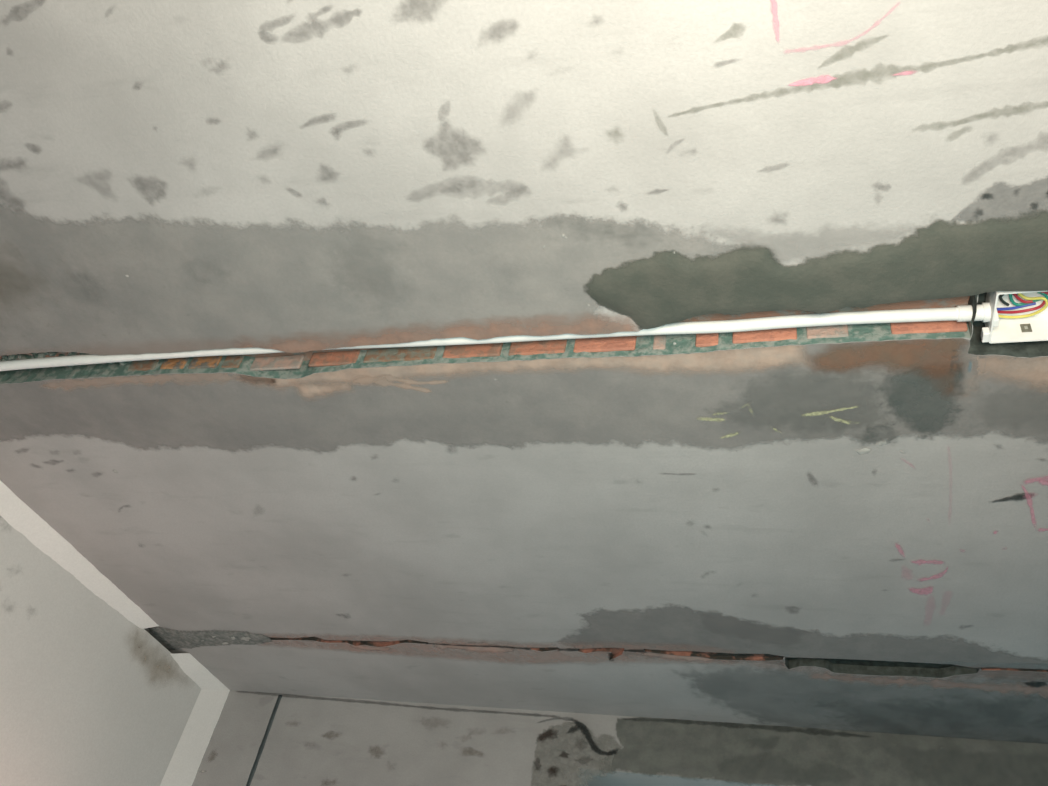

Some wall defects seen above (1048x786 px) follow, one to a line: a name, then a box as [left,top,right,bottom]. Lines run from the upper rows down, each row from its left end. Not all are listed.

leakage [0,204,759,356]
rust [815,339,964,373]
leakage [0,338,1048,452]
flaking render [148,627,272,651]
crack [314,636,400,644]
crack [427,643,645,660]
leakage [328,607,1048,697]
crack [674,651,796,661]
crack [821,658,1001,669]
flaking render [531,723,620,786]
leakage [602,717,1048,786]